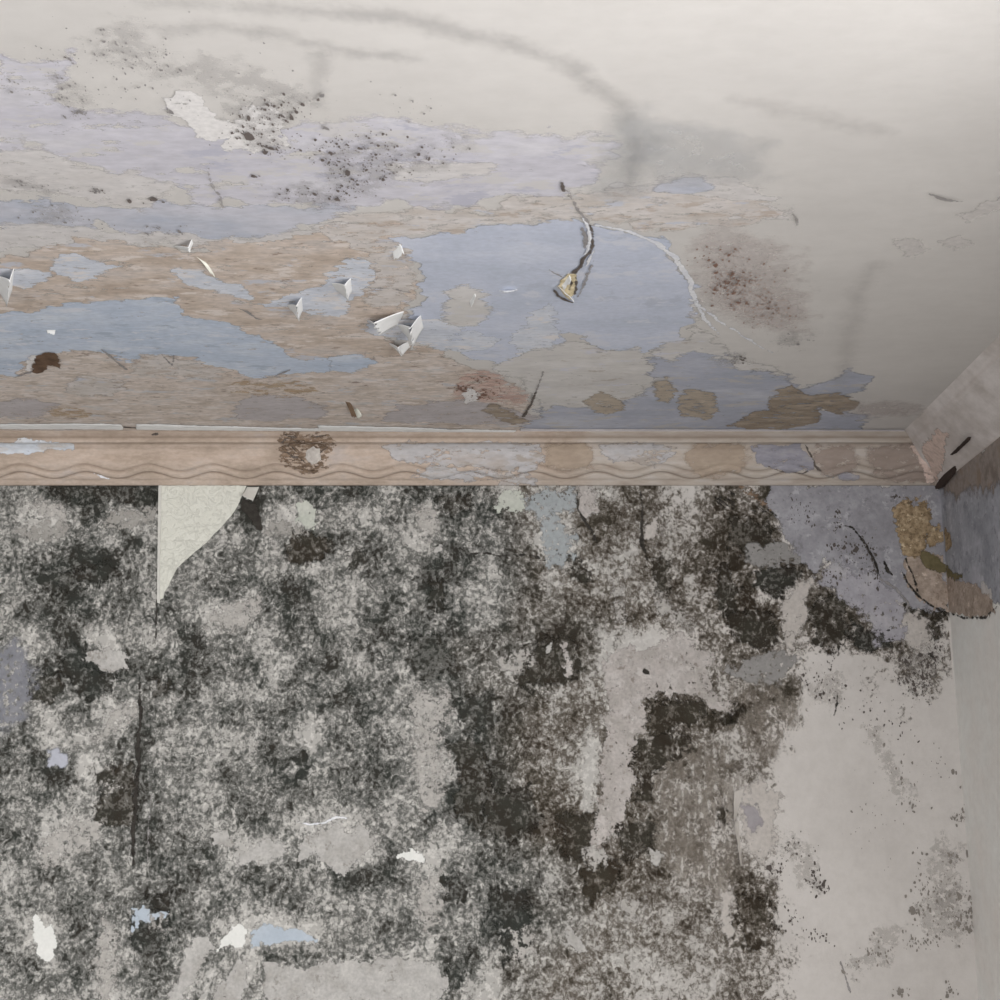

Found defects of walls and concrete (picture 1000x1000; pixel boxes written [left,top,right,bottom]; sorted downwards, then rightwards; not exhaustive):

leakage [222,70,471,204]
peeling [0,48,905,569]
crack [551,182,595,303]
leakage [686,246,815,347]
peeling [724,428,1000,686]
crack [844,525,909,616]
crack [130,600,158,866]
leakage [0,486,952,1000]
leakage [902,846,974,952]